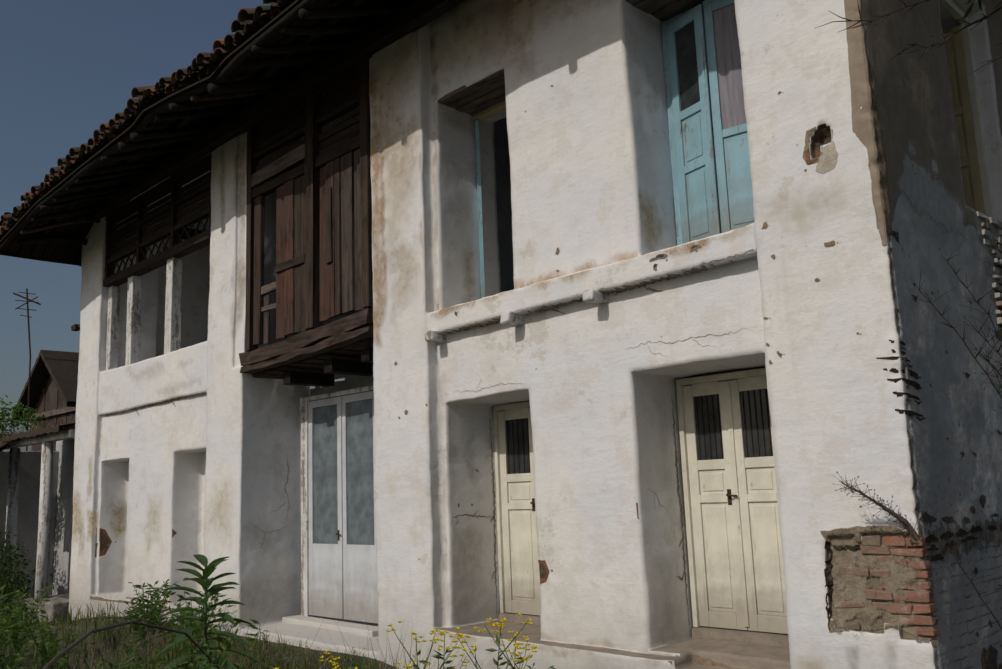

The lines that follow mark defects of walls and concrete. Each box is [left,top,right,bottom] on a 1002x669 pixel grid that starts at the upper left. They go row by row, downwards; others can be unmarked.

peeling [804,141,838,174]
flaking render [844,0,1002,331]
water stain [372,197,385,342]
crack [625,326,758,356]
crack [452,419,497,614]
spalling [821,525,914,548]
spalling [907,415,999,524]